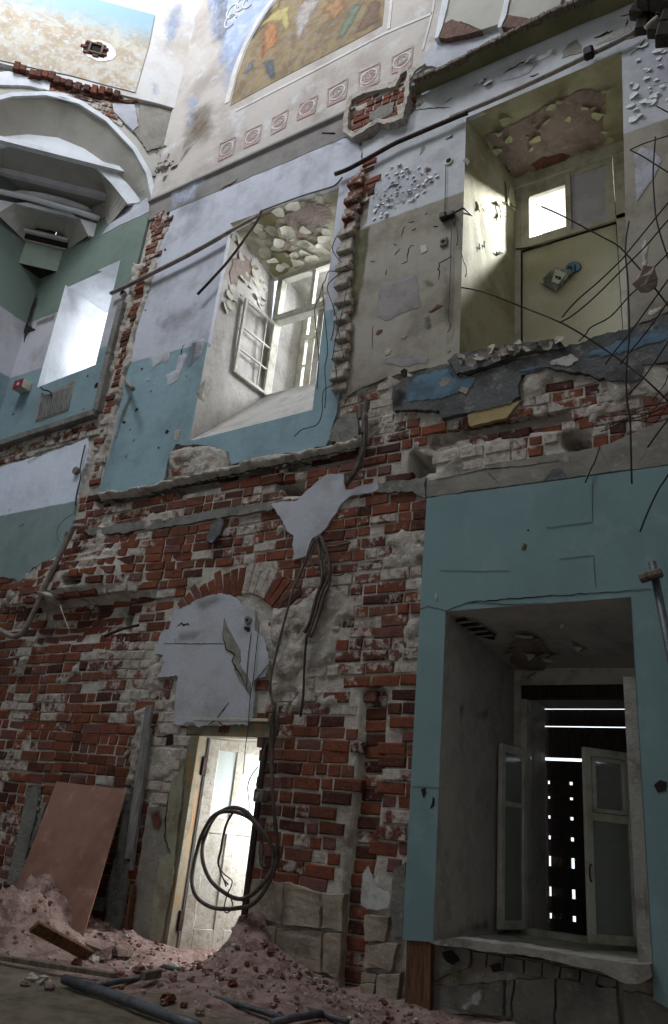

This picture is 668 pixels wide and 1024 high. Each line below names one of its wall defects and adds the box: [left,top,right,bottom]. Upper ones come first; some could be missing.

flaking render [12,61,178,182]
flaking render [343,0,598,144]
peeling [469,89,614,217]
peeling [625,39,668,122]
spalling [224,145,438,394]
flaking render [0,210,205,486]
crack [421,555,641,611]
flaking render [222,618,269,695]
flaking render [145,723,190,806]